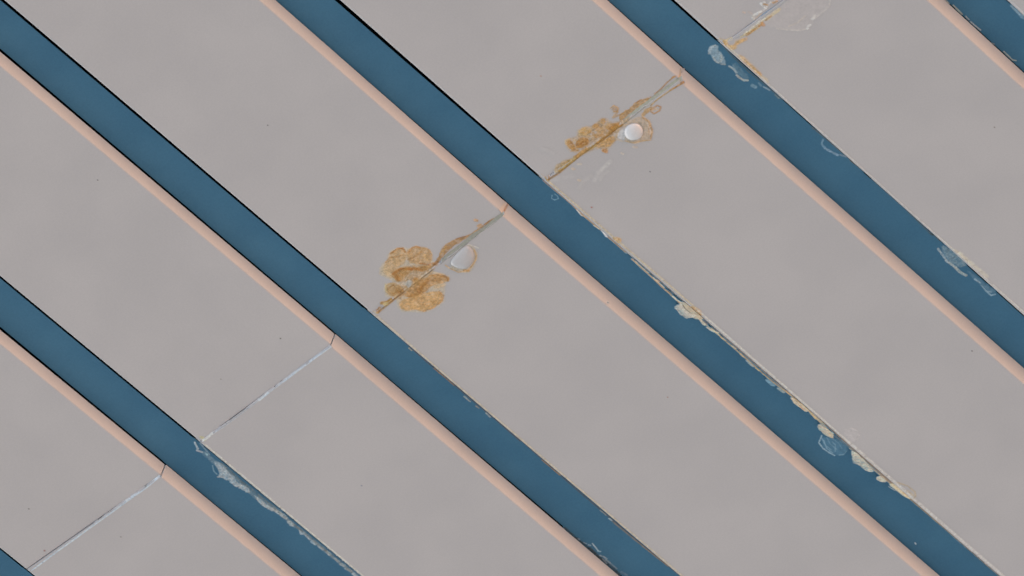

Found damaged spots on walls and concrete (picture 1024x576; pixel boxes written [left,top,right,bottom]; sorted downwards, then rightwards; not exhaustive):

peeling [707,44,779,100]
crack [551,76,683,177]
corrosion [372,201,509,315]
crack [382,212,504,309]
peeling [673,301,703,320]
corrosion [541,67,1000,576]
crack [199,345,332,442]
peeling [817,434,849,457]
crack [30,475,161,571]